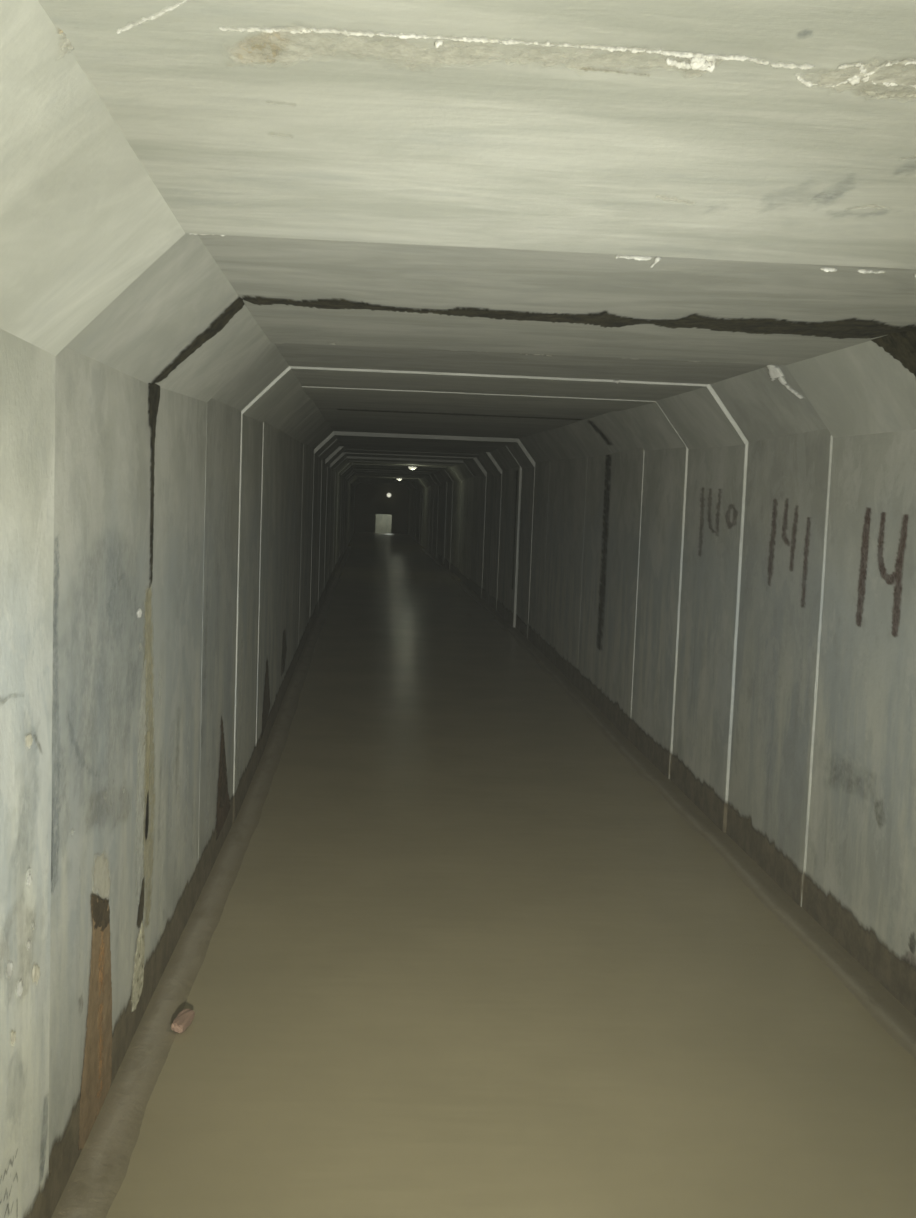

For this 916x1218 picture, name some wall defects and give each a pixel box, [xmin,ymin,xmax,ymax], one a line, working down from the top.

crack [338,409,611,650]
crack [148,296,916,589]
leakage [51,797,73,875]
rust [78,855,112,1150]
flaking render [132,923,145,1012]
leakage [104,552,343,1089]
leakage [438,554,916,1018]
leakage [24,1097,84,1218]